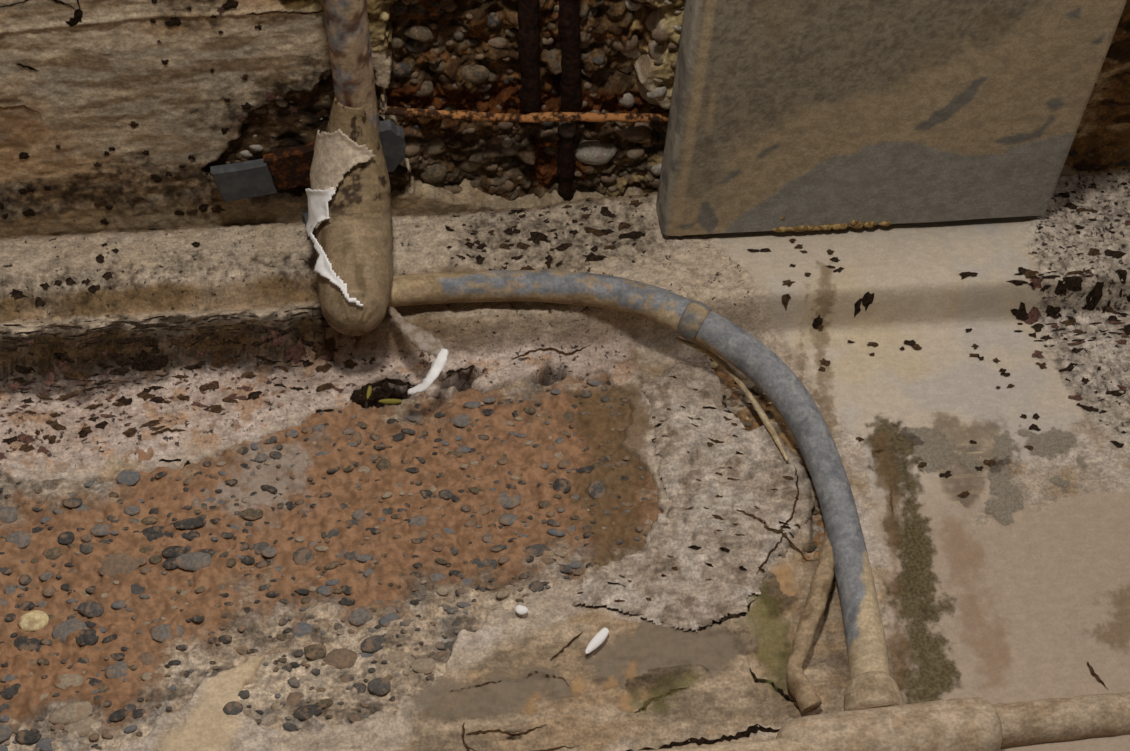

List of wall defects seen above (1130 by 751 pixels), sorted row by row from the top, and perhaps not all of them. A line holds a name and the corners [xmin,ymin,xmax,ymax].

crack [0,0,83,27]
peeling [282,0,315,8]
spalling [206,74,335,166]
rust [385,81,668,126]
spalling [375,0,685,201]
water stain [781,264,811,310]
water stain [854,292,874,318]
water stain [900,340,922,350]
water stain [965,328,1015,389]
spalling [0,372,664,751]
crack [640,464,809,632]
water stain [856,416,960,704]